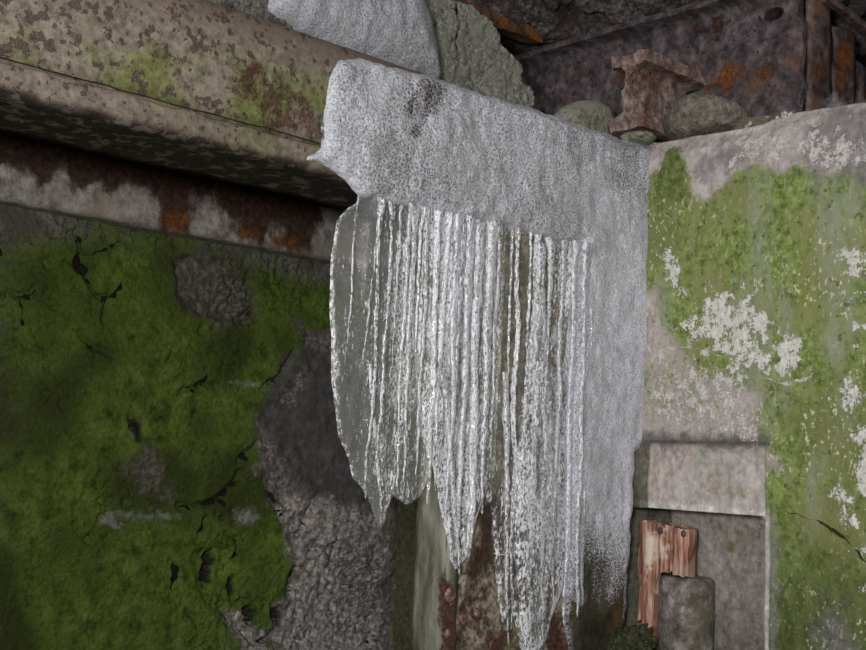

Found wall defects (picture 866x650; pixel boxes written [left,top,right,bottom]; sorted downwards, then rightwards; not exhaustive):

rust [232,61,325,141]
damp [701,104,866,183]
crack [72,235,124,310]
crack [181,372,212,398]
efflorescence [650,340,759,451]
crack [178,447,251,532]
crack [266,490,316,525]
spalling [222,491,395,650]
crack [775,506,866,562]